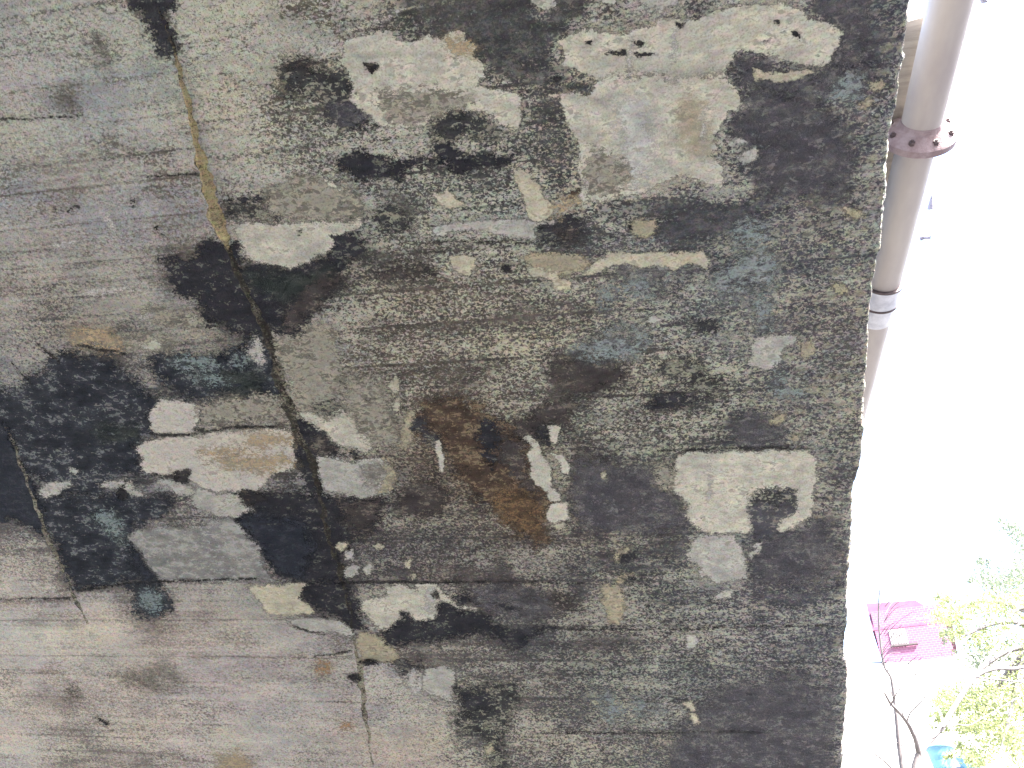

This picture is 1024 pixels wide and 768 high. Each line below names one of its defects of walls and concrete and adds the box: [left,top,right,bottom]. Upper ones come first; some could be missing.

peeling [339,30,523,133]
crack [146,171,199,179]
peeling [234,170,369,271]
peeling [431,0,844,292]
damp [245,265,350,337]
damp [0,419,49,537]
crack [148,425,276,437]
peeling [95,318,478,684]
rust [391,352,632,554]
peeling [648,434,820,601]
damp [125,539,165,618]
crack [287,623,396,663]